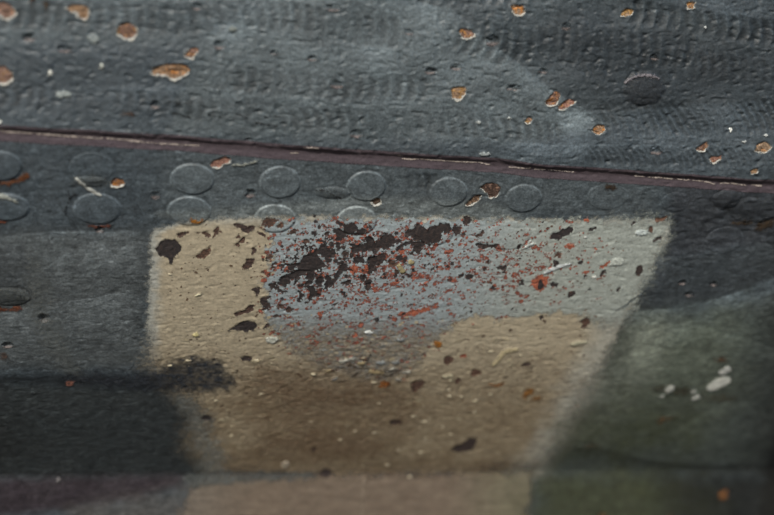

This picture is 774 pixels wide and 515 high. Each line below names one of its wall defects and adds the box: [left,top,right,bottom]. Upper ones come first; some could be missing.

peeling [0,2,17,21]
peeling [65,4,90,21]
peeling [116,23,138,41]
peeling [0,66,13,86]
peeling [451,86,467,102]
peeling [545,91,577,111]
peeling [754,134,772,154]
peeling [235,182,671,381]
leakage [62,356,314,488]